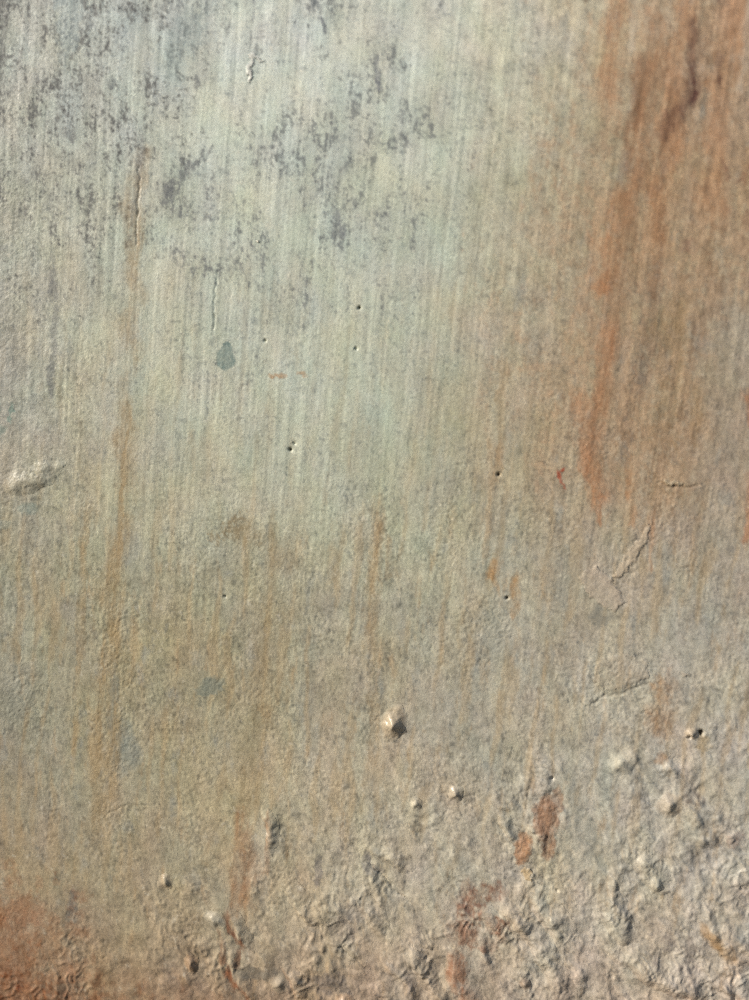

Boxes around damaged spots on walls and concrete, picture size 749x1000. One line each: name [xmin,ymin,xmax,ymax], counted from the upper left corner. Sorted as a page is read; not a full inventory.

water stain [0,0,512,463]
rust [448,0,749,623]
rust [0,802,272,1000]
rust [443,875,508,958]